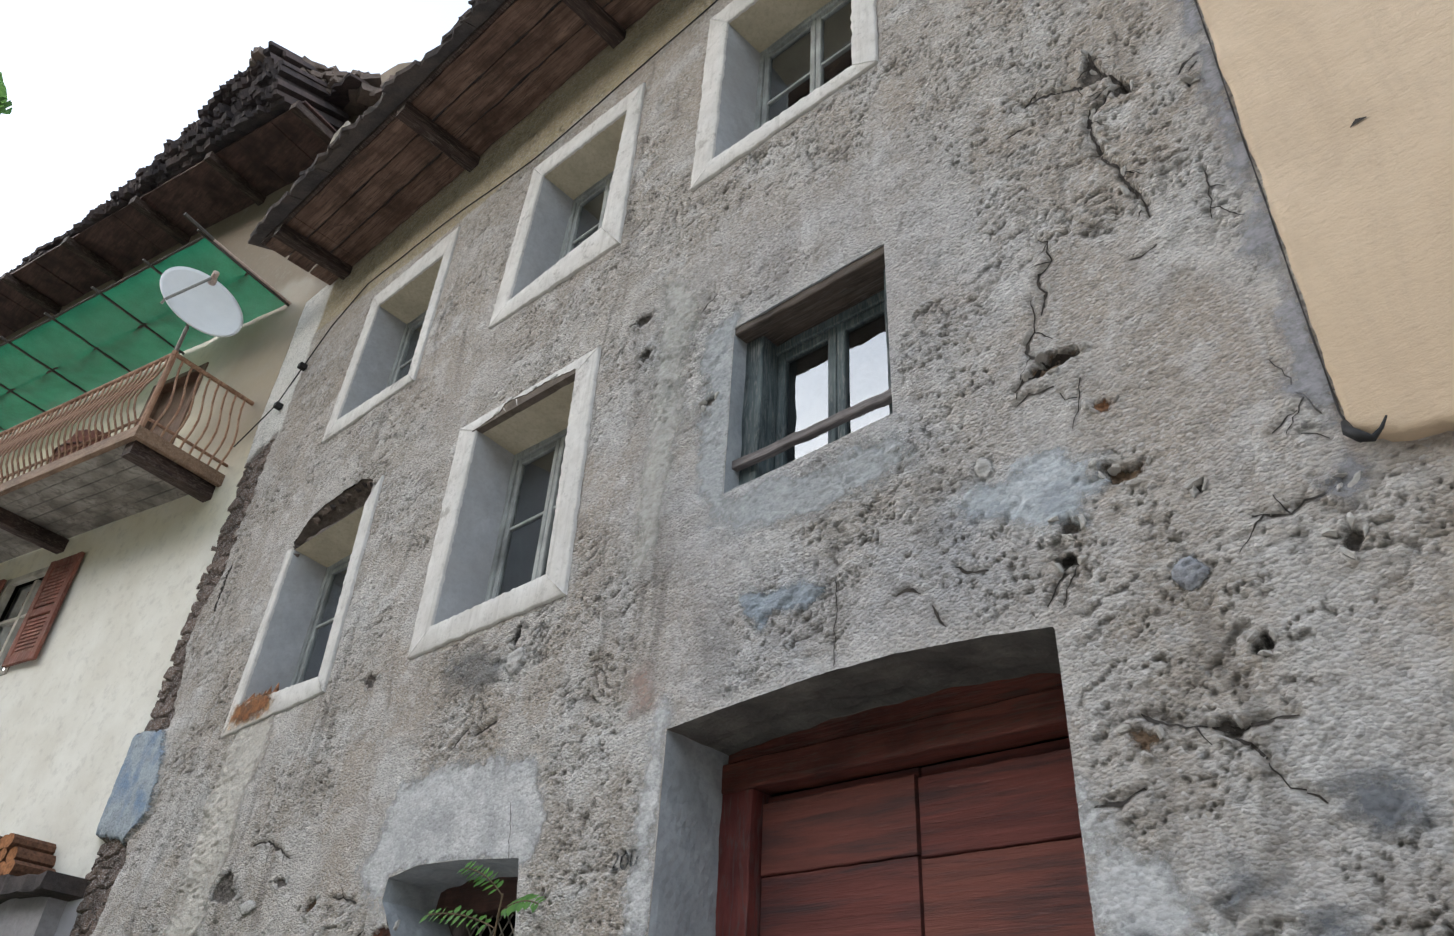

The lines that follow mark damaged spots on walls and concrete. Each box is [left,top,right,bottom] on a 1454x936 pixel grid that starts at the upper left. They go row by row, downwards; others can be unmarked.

crack [1006,53,1157,260]
crack [1015,240,1081,429]
spalling [1023,342,1086,382]
crack [1240,486,1336,552]
crack [1141,713,1328,804]